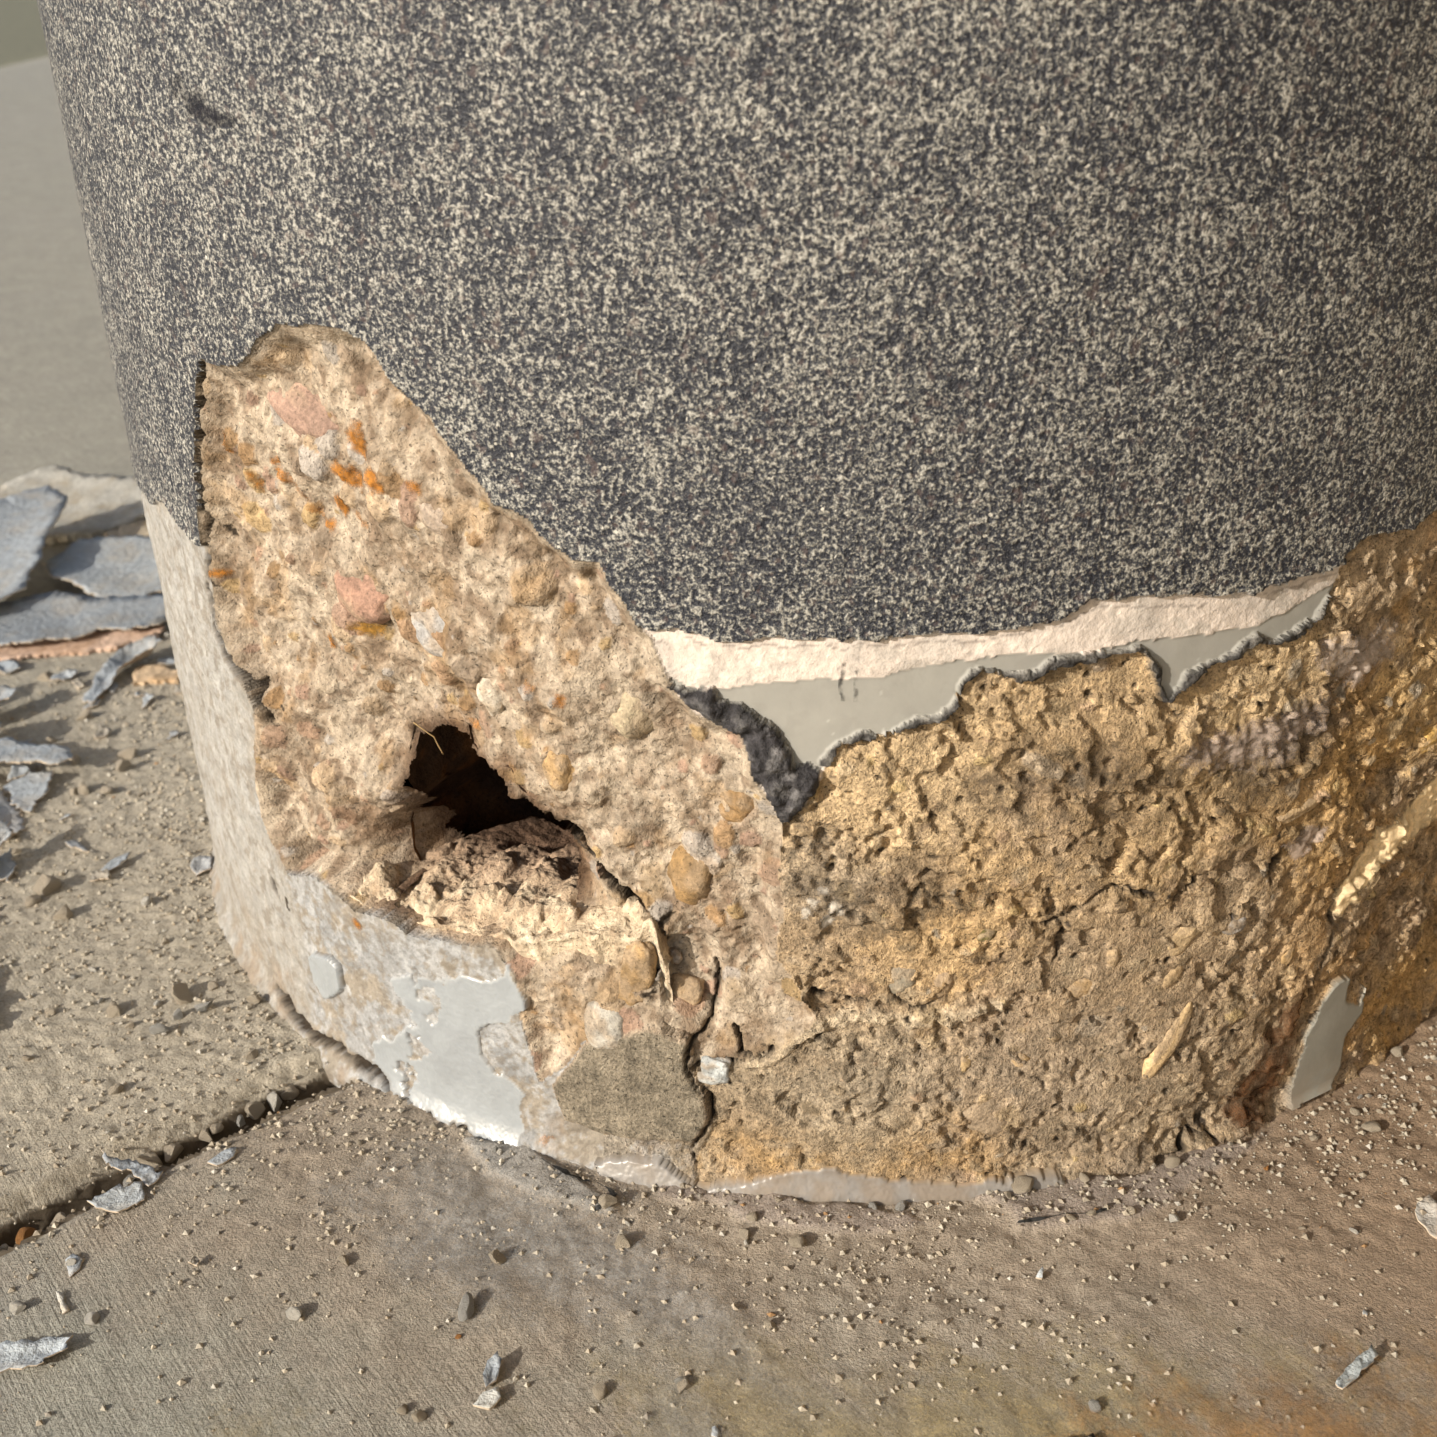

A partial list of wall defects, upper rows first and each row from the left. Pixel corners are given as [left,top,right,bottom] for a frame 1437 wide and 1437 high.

crack [686,966,776,1164]
peeling [190,322,1437,1206]